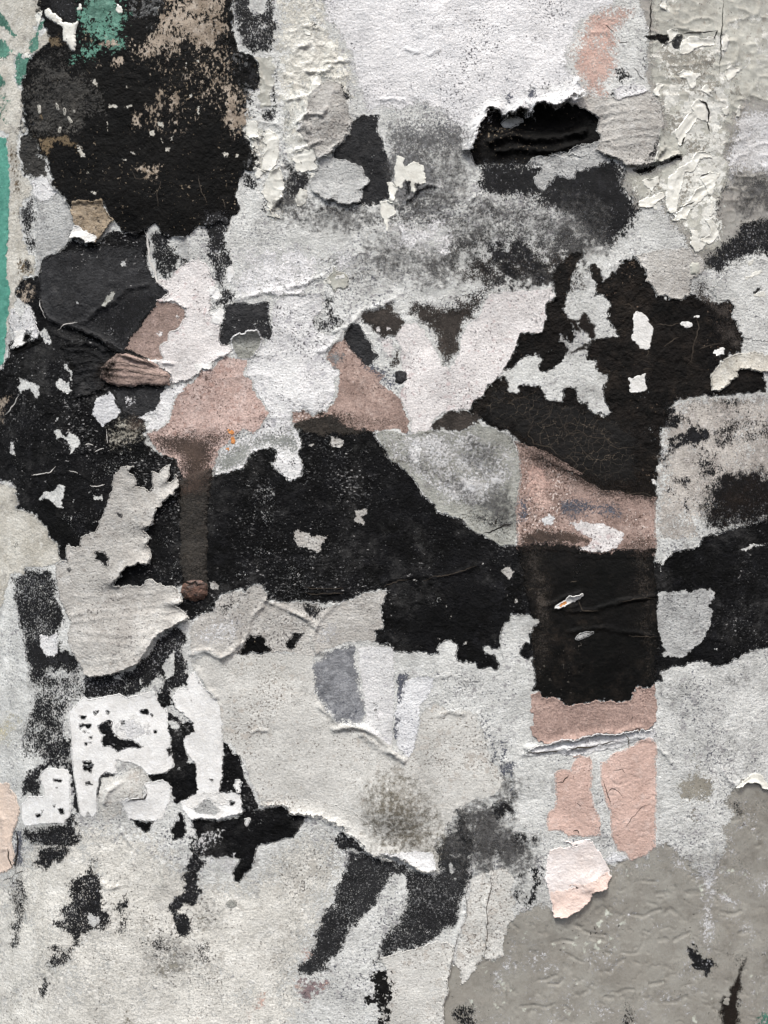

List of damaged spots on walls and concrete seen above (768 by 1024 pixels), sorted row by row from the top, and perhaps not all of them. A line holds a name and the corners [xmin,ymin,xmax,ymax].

peeling [501,113,523,128]
peeling [613,0,768,254]
peeling [139,650,175,694]
peeling [186,792,230,816]